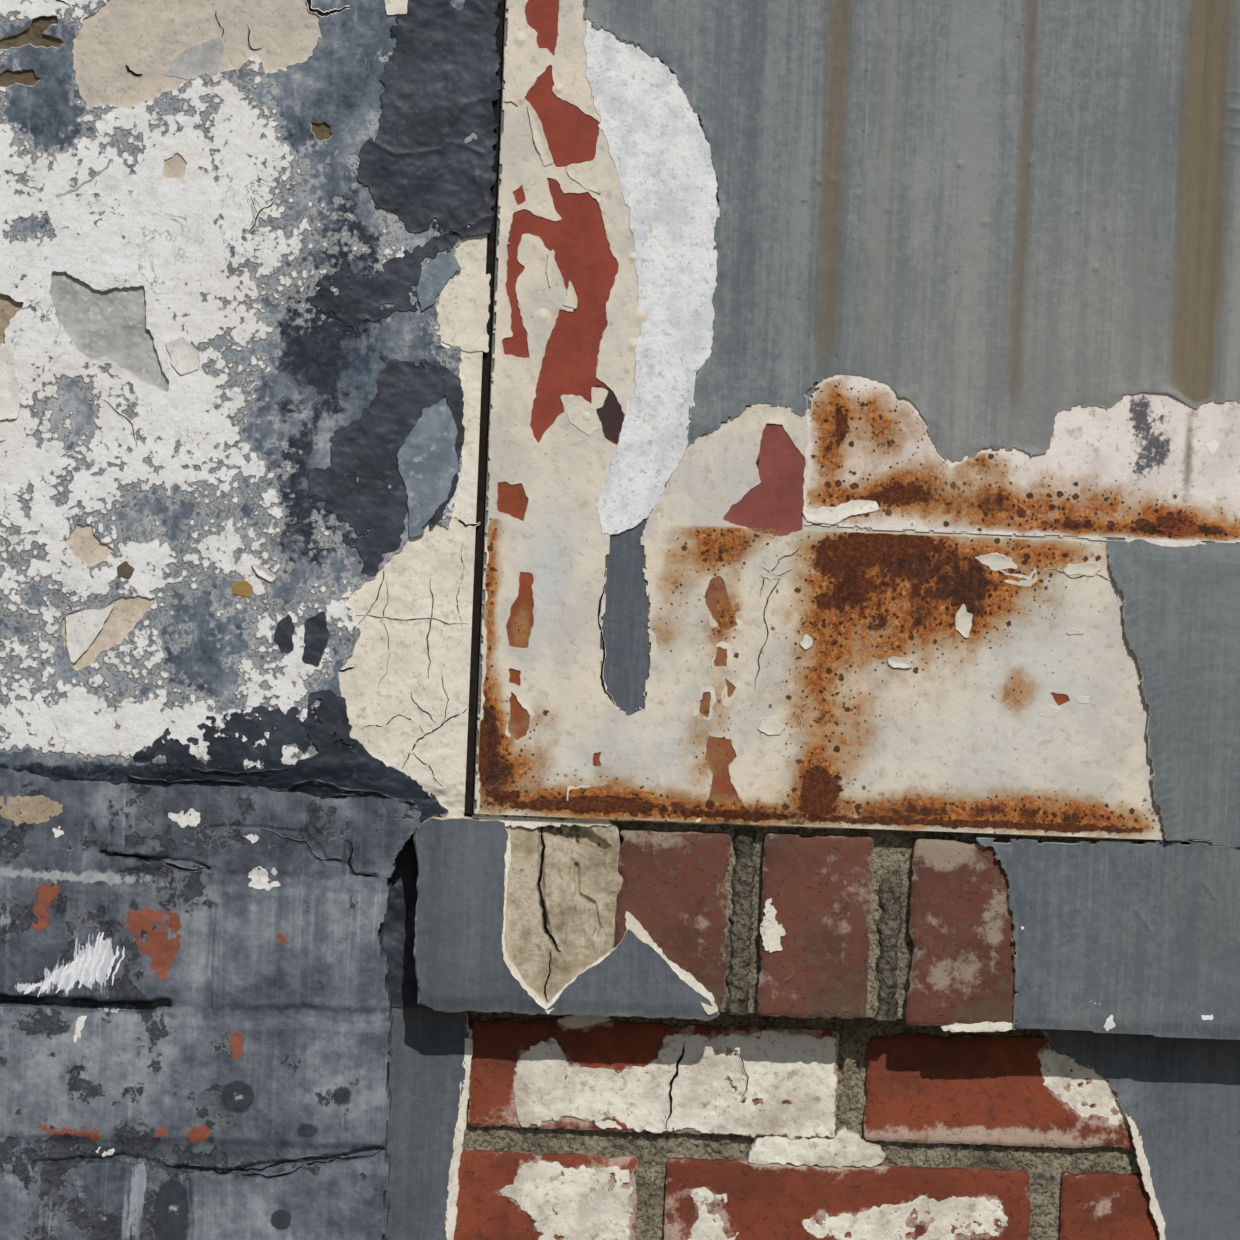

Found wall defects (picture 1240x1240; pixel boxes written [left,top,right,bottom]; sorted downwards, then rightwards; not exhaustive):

corrosion [478,381,1240,836]